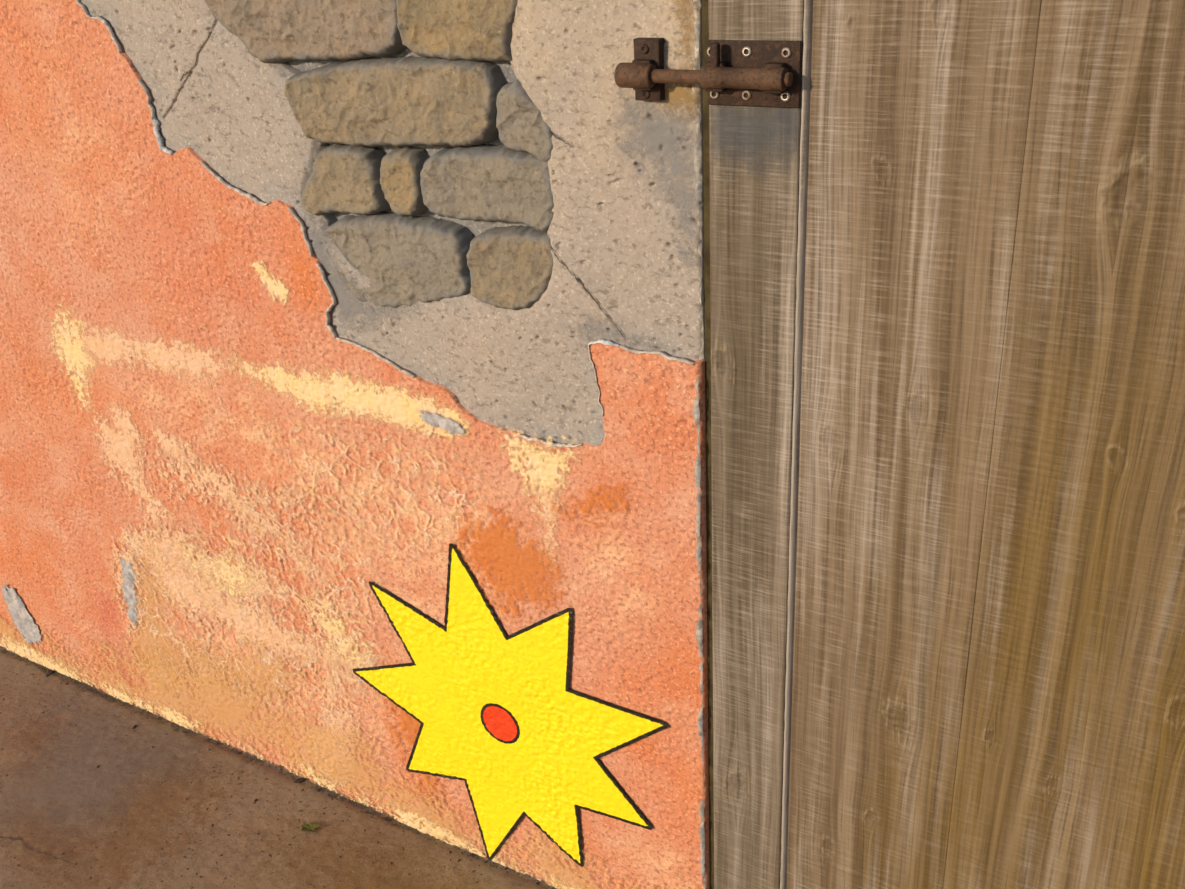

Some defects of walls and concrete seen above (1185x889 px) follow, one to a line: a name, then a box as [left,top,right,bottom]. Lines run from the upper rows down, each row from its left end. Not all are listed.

crack [163,19,217,118]
rust [665,84,701,112]
peeling [76,0,705,447]
crack [550,247,626,339]
peeling [1,585,42,646]
peeling [92,402,480,758]
spalling [692,378,706,889]